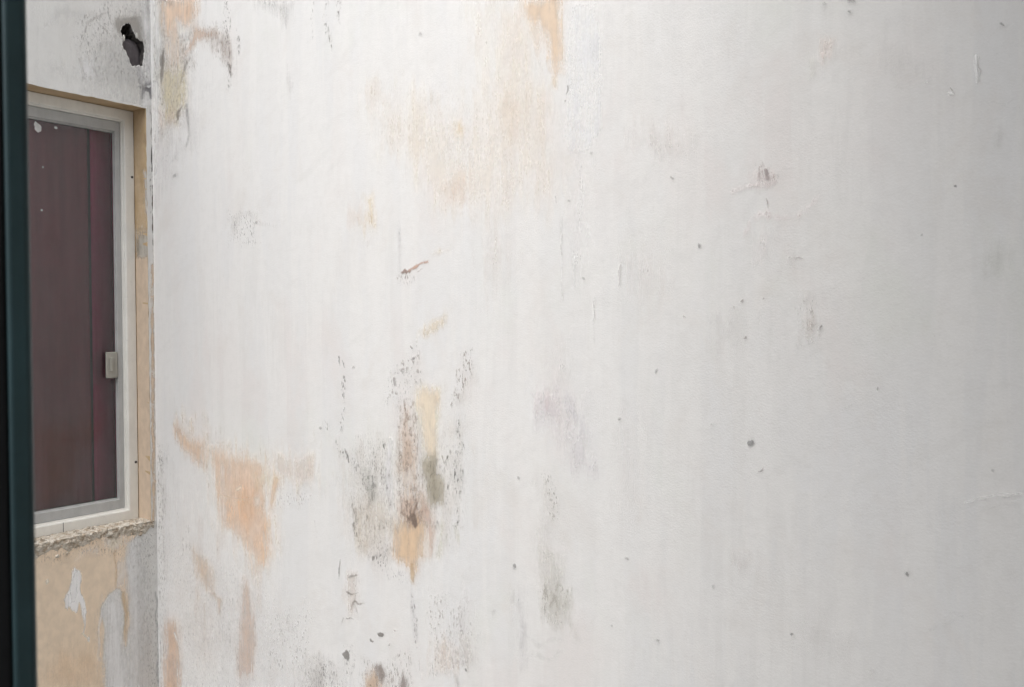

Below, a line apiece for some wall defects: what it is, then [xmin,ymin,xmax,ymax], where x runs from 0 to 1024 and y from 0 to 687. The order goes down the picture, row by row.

hole [116,17,144,66]
peeling [35,235,154,687]
peeling [215,449,277,563]
damp [340,403,463,538]